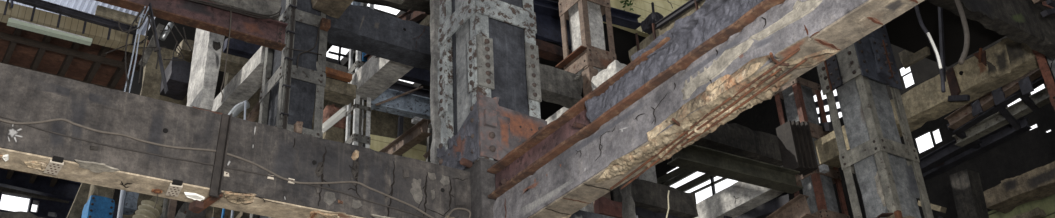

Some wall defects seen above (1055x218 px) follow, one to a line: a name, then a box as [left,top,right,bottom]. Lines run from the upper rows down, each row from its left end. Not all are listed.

corrosion [494,105,547,152]
crack [545,83,676,215]